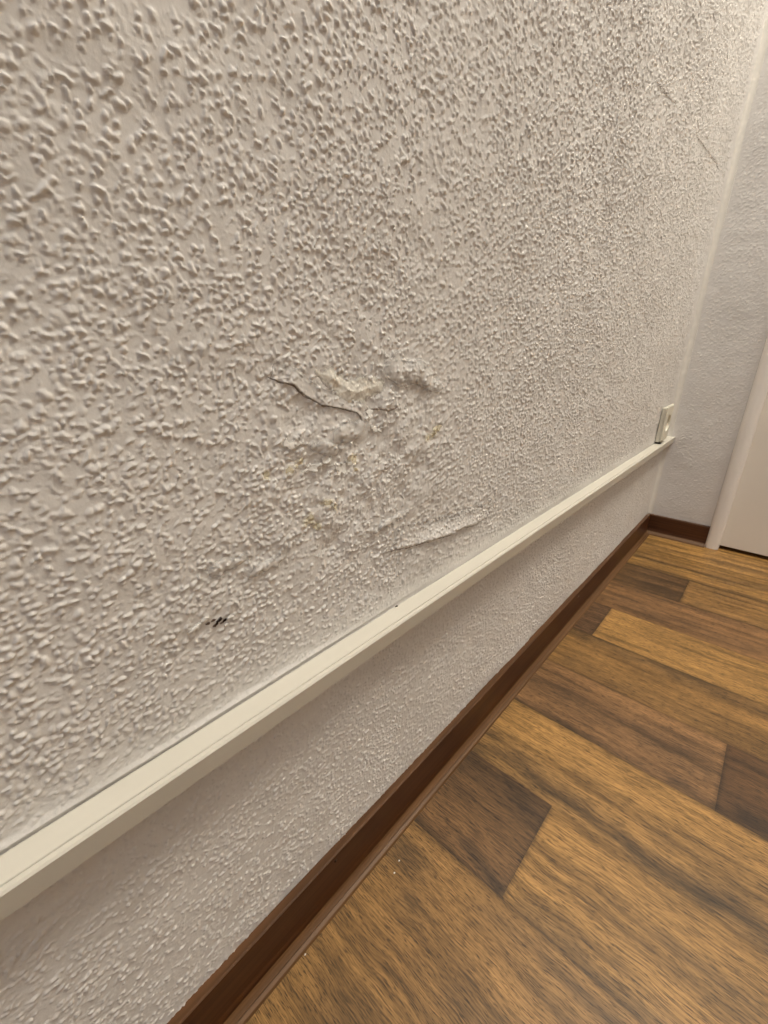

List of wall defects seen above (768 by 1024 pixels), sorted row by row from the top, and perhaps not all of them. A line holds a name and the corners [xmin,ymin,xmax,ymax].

crack [268,364,397,422]